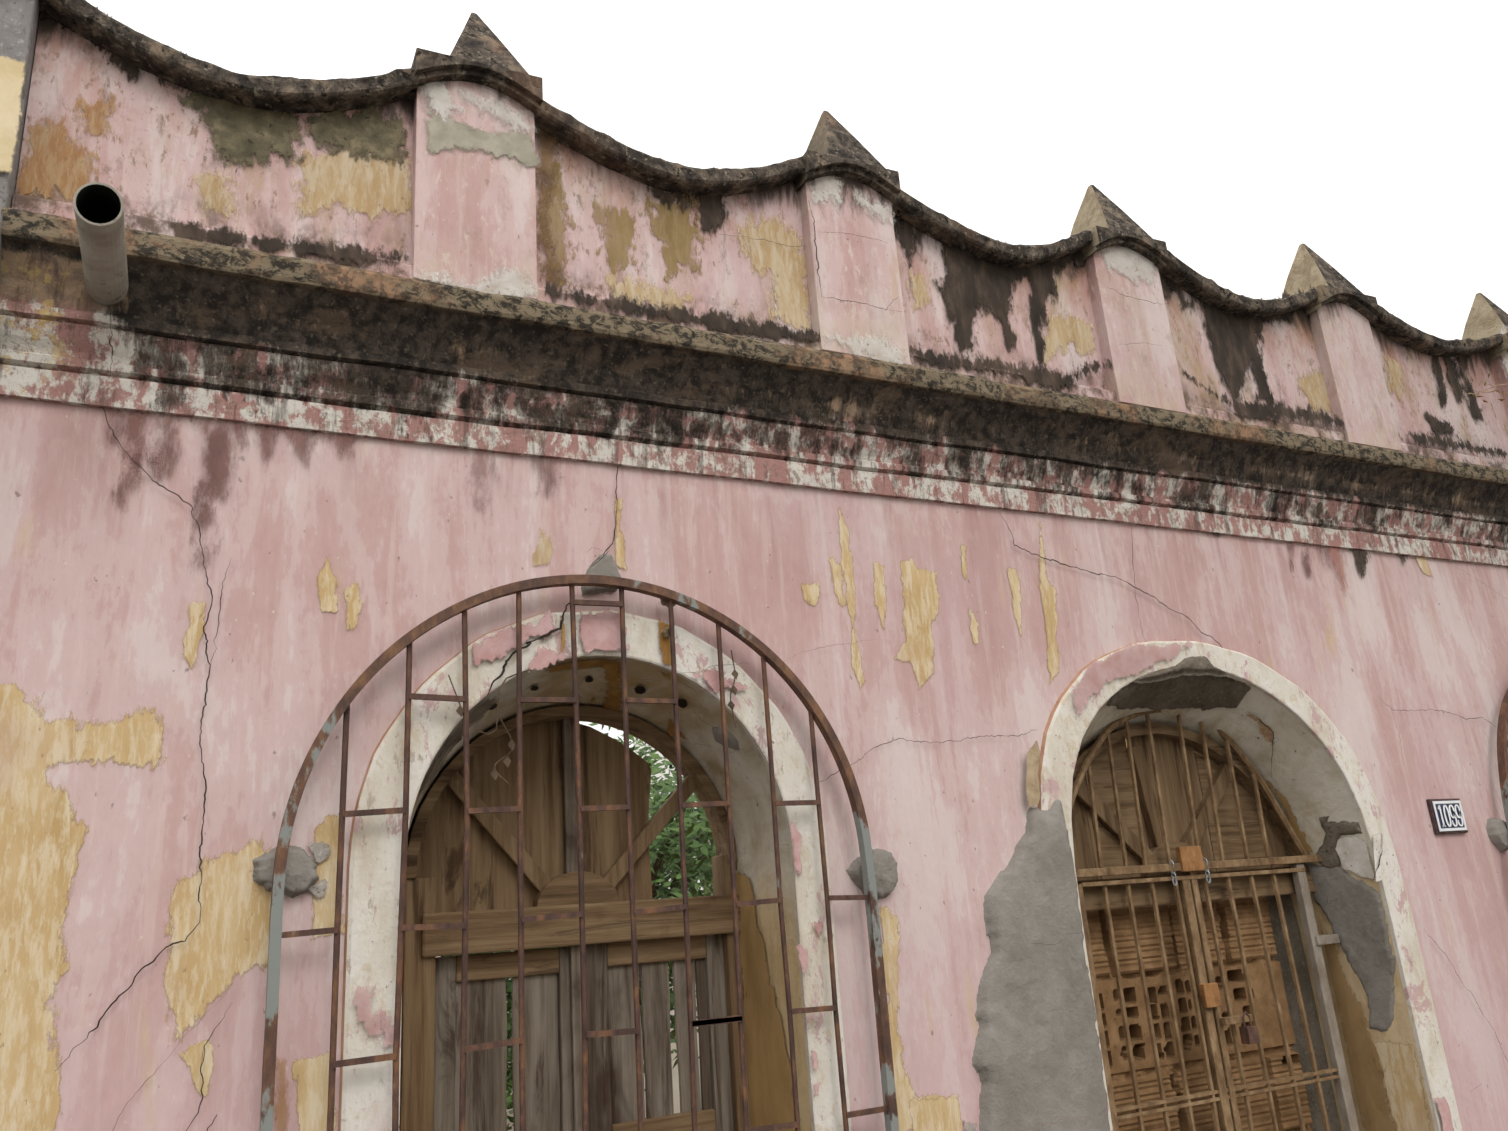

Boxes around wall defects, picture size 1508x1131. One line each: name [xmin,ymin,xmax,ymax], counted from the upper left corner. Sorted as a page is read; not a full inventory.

peeling [0,56,121,202]
damp [171,217,409,266]
damp [910,241,1113,392]
damp [1162,275,1344,430]
damp [1408,355,1507,458]
crack [55,309,231,1071]
corrosion [546,616,622,712]
corrosion [657,619,671,679]
peeling [0,683,167,1131]
peeling [163,832,271,1097]
crack [112,988,232,1131]
peeling [292,1052,338,1131]